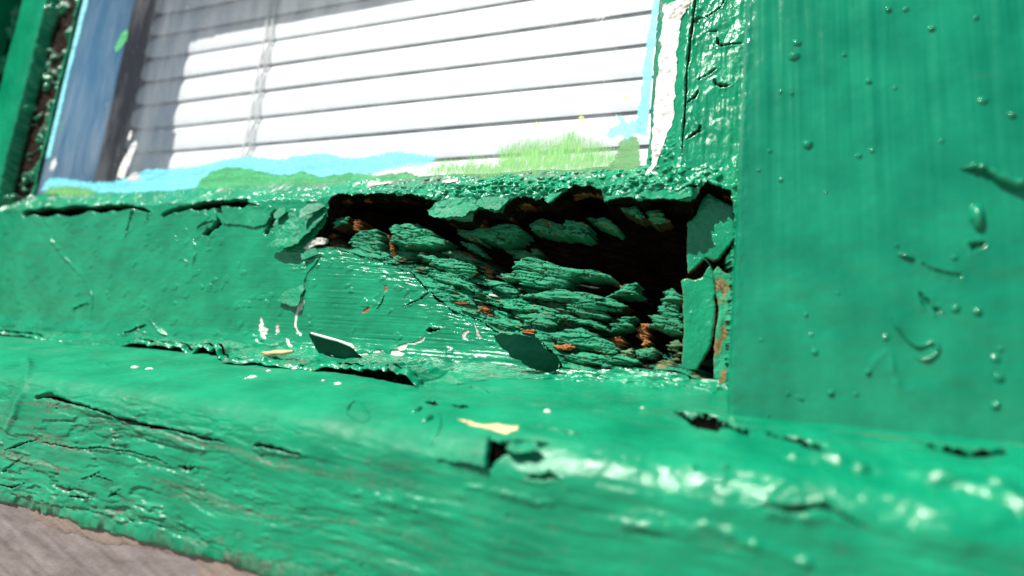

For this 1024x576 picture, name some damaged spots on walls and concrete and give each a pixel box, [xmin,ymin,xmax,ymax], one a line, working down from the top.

crack [682,1,741,154]
crack [41,207,151,227]
crack [187,201,276,231]
spalling [216,180,735,389]
crack [41,396,220,441]
crack [1,440,196,499]
crack [258,444,303,457]
peeling [432,419,548,468]